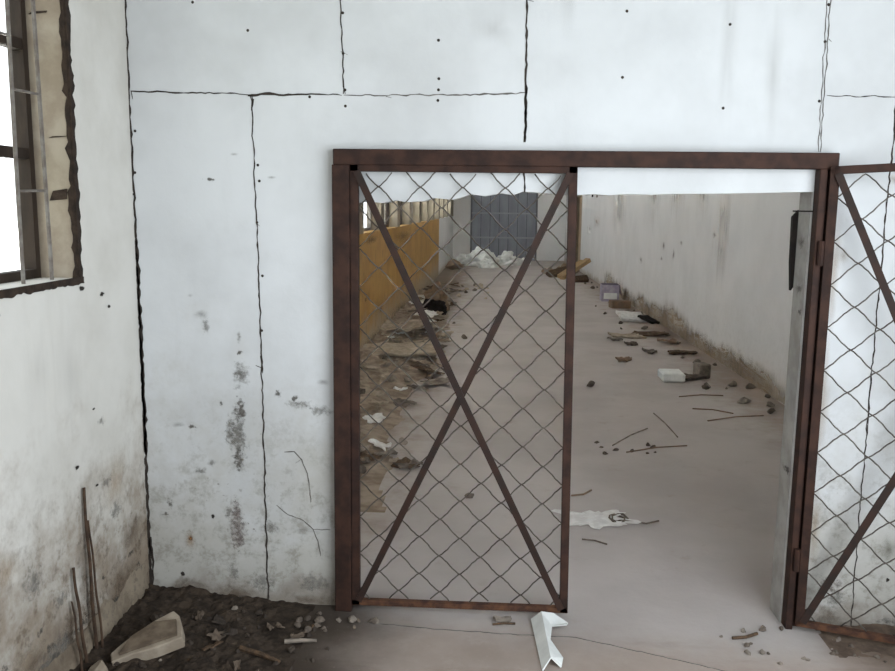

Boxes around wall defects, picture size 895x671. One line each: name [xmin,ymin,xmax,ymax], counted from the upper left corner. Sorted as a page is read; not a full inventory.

leakage [228,401,245,468]